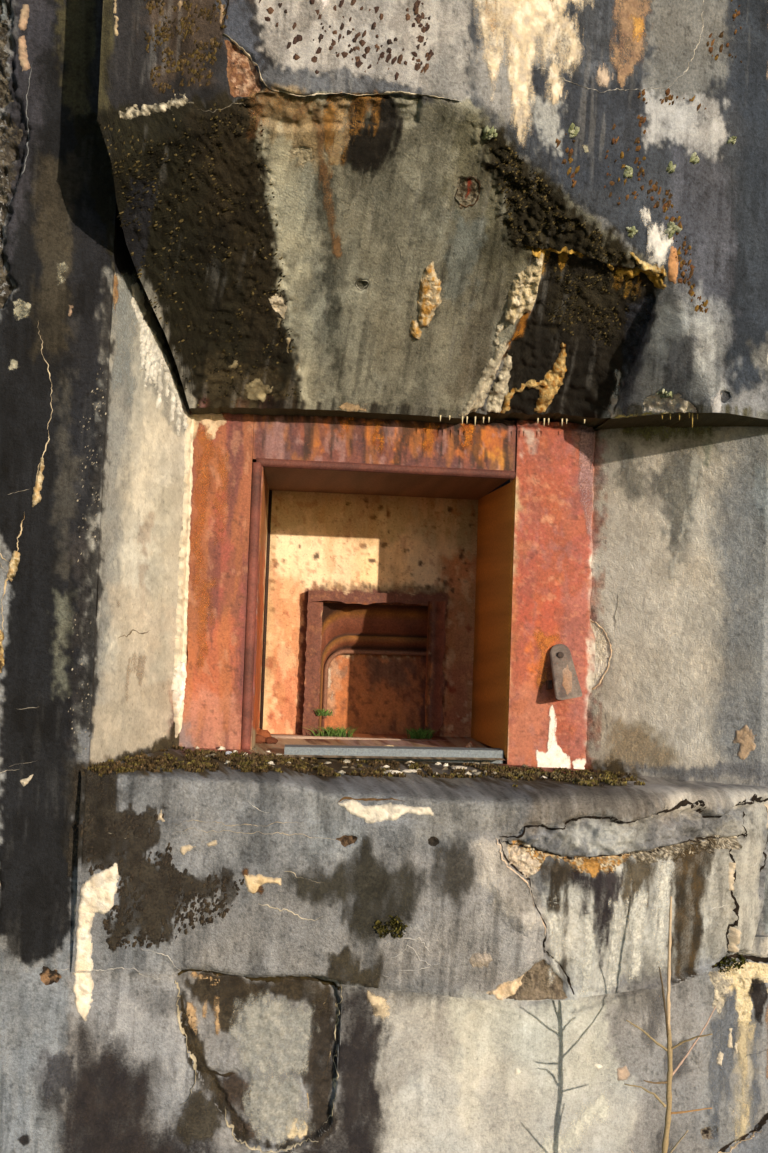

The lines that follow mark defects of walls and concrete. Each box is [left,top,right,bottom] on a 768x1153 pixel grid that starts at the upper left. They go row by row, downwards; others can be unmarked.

efflorescence [118,94,194,120]
water stain [112,273,189,436]
crack [0,322,53,644]
rust [461,422,474,448]
rust [562,664,572,695]
rust [255,728,278,744]
water stain [66,722,244,952]
peeling [39,863,120,1021]
water stain [40,836,474,1153]
spalling [486,959,567,1001]
spalling [708,926,768,1027]
crack [718,1113,768,1153]